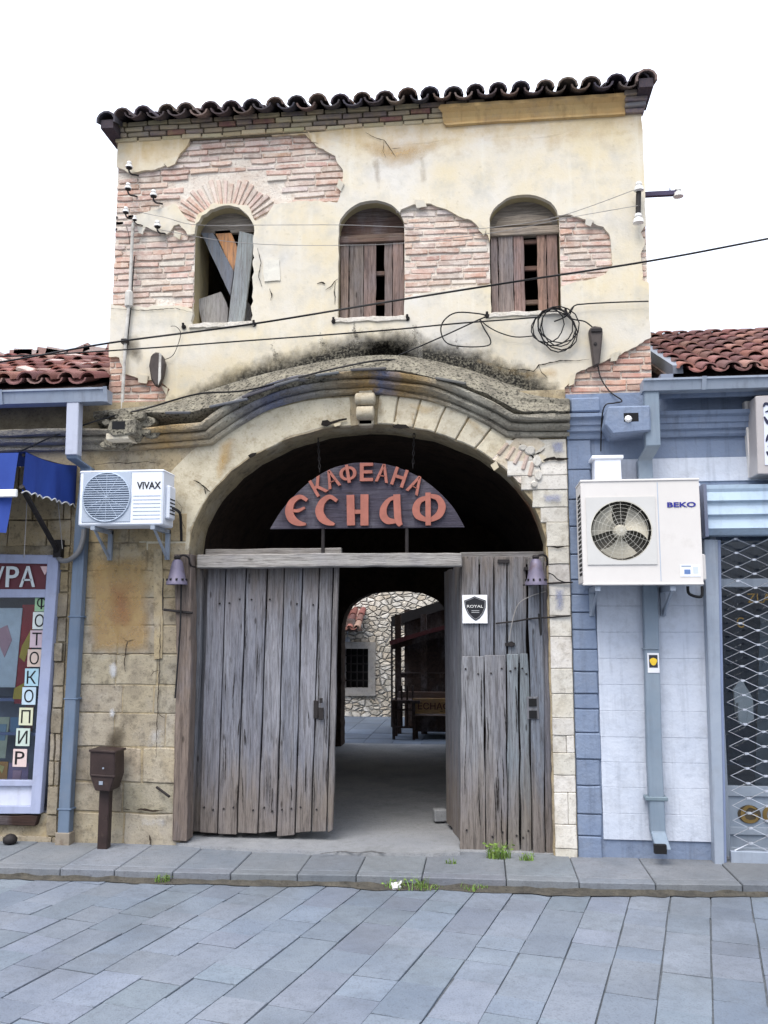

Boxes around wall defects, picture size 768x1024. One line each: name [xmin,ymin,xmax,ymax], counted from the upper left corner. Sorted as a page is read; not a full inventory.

flaking render [113,132,344,310]
flaking render [396,199,490,298]
flaking render [559,216,612,286]
flaking render [109,357,169,403]
damp [200,323,555,393]
flaking render [564,339,652,394]
flaking render [491,443,546,488]